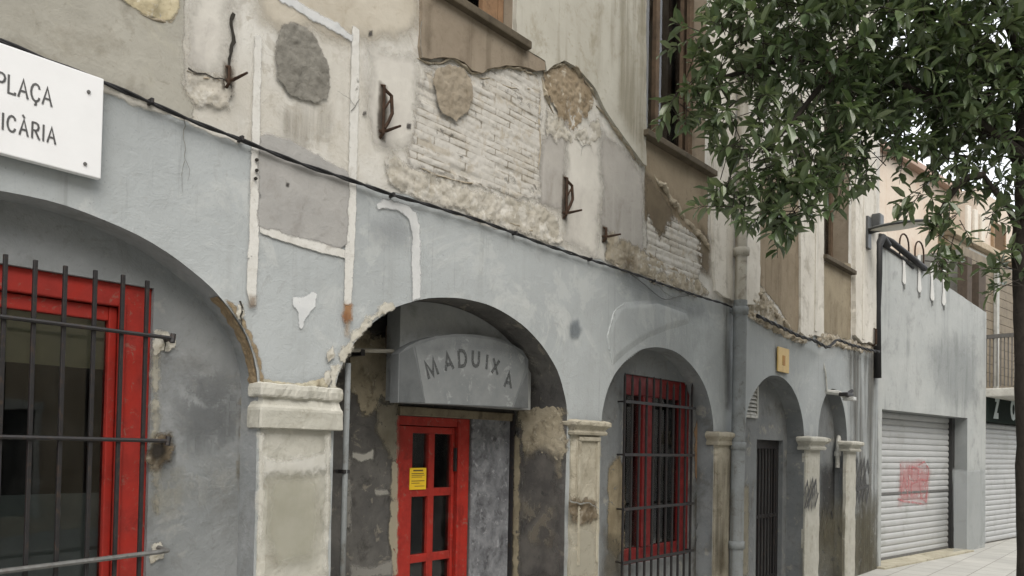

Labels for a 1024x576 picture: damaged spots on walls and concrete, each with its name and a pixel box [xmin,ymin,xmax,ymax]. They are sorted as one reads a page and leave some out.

corrosion [342,304,352,322]
flaking render [385,58,639,244]
flaking render [605,174,710,297]
spalling [748,286,873,353]
flaking render [210,292,400,576]
peeling [512,406,569,576]